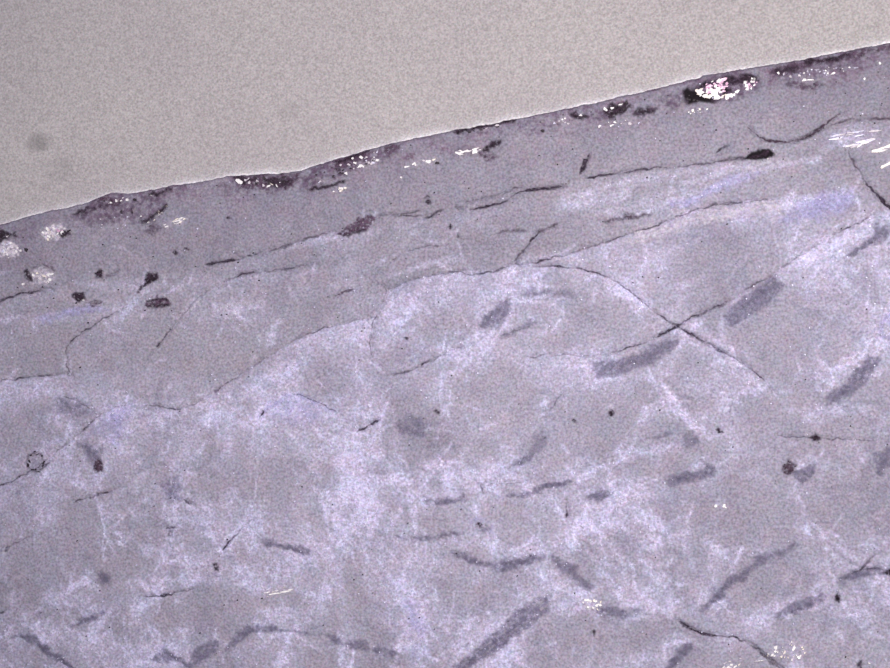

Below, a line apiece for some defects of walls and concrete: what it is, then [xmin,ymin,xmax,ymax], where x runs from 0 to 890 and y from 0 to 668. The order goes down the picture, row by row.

crack [756,117,842,143]
crack [580,155,654,179]
crack [474,186,556,210]
crack [866,184,890,209]
crack [530,234,603,276]
crack [659,315,697,338]
crack [680,621,763,654]